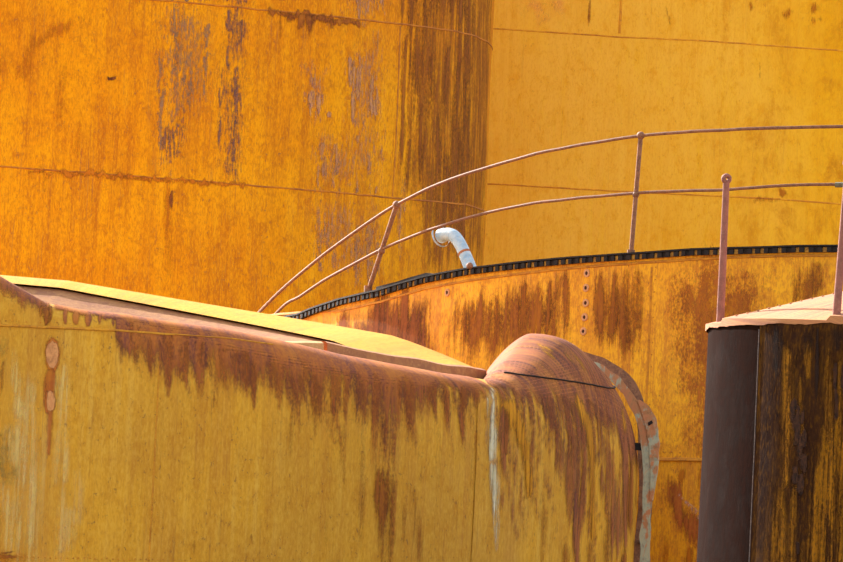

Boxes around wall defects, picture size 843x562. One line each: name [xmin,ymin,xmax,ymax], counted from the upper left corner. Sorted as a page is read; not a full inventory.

rust [268,7,360,32]
rust [400,0,492,268]
rust [30,169,245,231]
rust [796,265,822,300]
rust [0,272,642,562]
leakage [487,388,498,541]
rust [667,470,699,562]